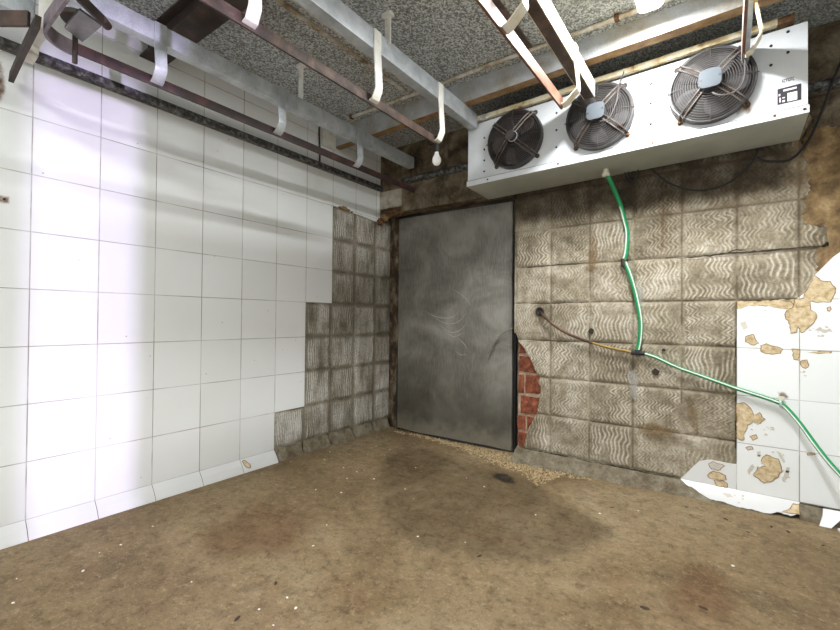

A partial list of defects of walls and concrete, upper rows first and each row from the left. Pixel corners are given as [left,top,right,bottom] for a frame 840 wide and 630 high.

peeling [274,206,405,448]
peeling [514,114,840,504]
spalling [783,503,801,515]